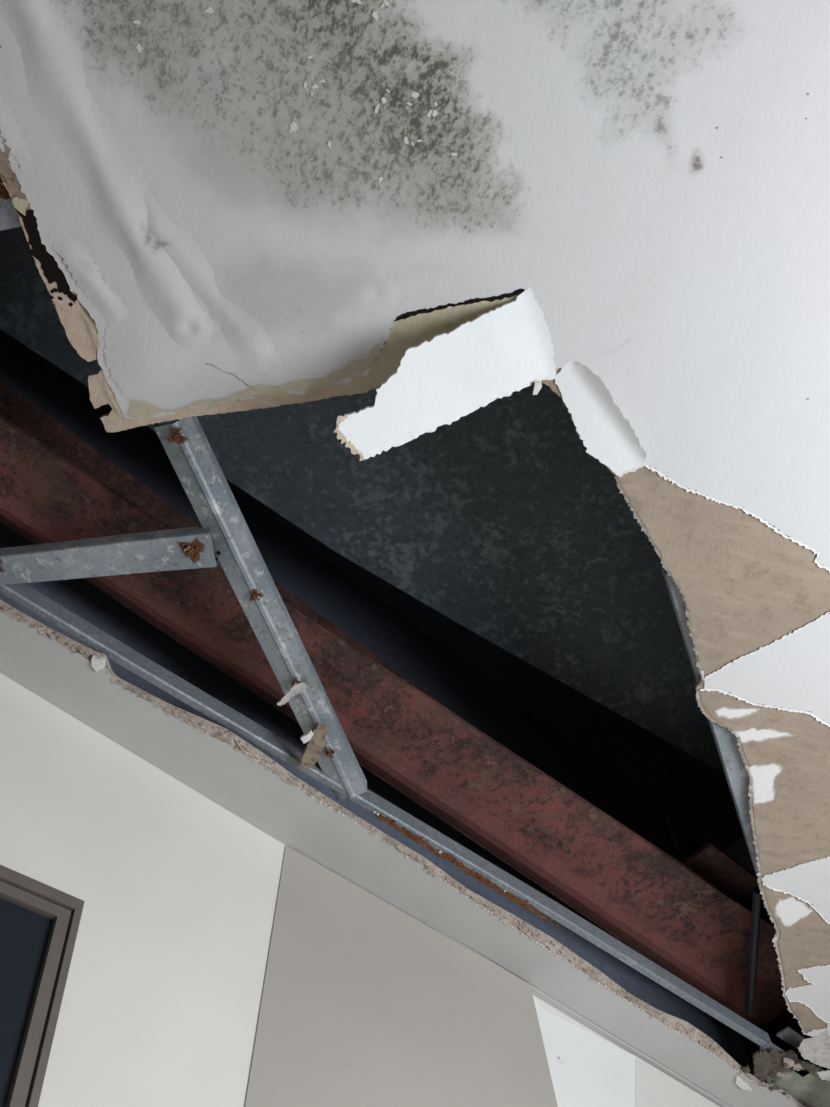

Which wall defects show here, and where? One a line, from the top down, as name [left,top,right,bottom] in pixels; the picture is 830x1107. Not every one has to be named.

leakage [88,0,516,221]
leakage [536,0,725,133]
corrosion [166,427,188,444]
peeling [334,287,556,461]
corrosion [178,539,204,562]
peeling [618,465,830,1035]
spalling [0,599,806,1107]
corrosion [373,811,559,927]